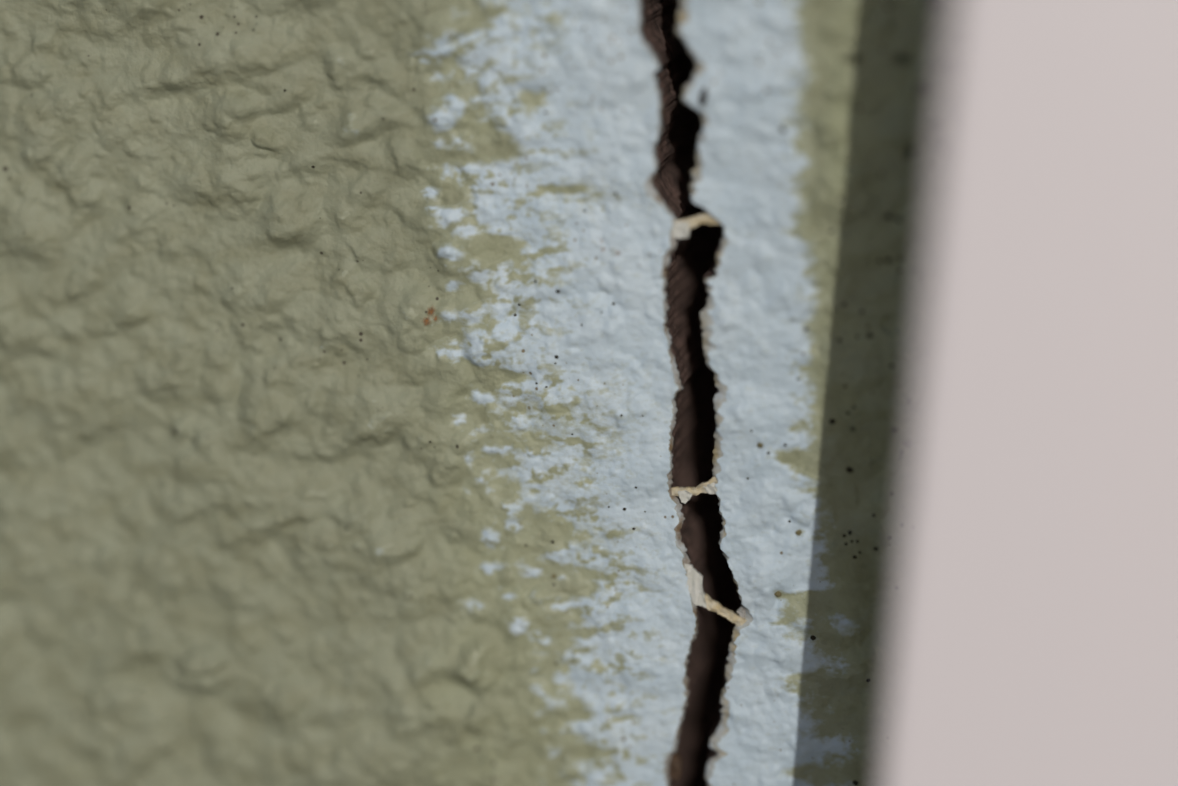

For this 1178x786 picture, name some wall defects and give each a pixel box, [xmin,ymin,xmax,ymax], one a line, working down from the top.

crack [637,0,753,786]